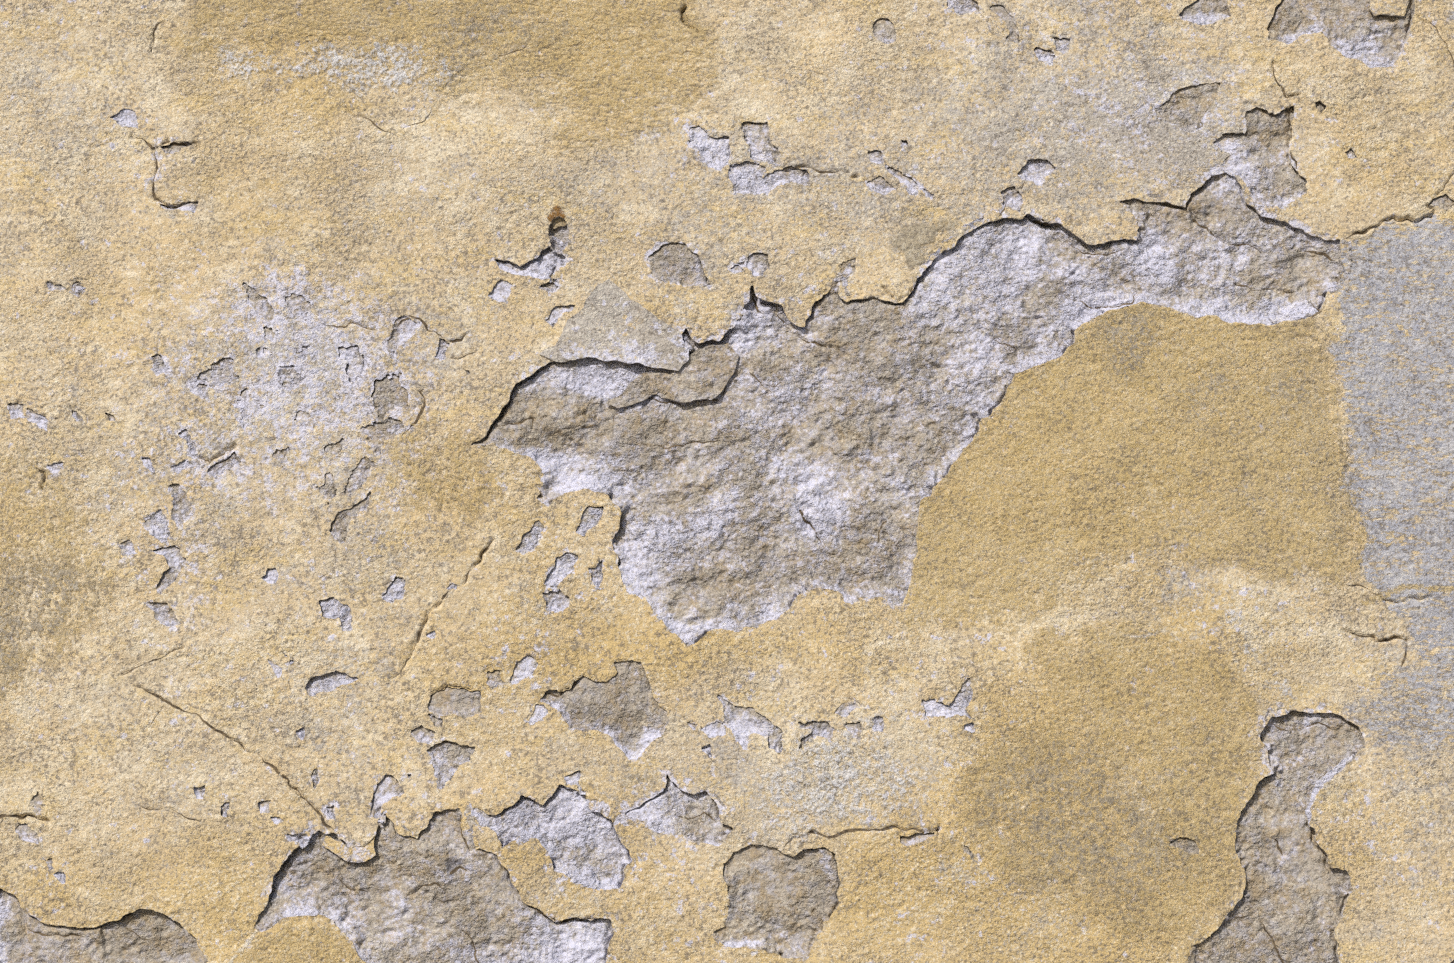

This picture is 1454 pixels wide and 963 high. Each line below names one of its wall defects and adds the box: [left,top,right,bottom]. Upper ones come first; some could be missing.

spalling [1267,0,1414,68]
peeling [117,429,241,627]
peeling [189,357,264,429]
peeling [242,282,311,389]
peeling [319,597,356,631]
peeling [382,576,405,602]
peeling [316,301,474,579]
spalling [471,67,1454,646]
spalling [0,888,207,963]
crack [123,648,345,839]
spalling [254,652,884,963]
spalling [1188,702,1373,963]